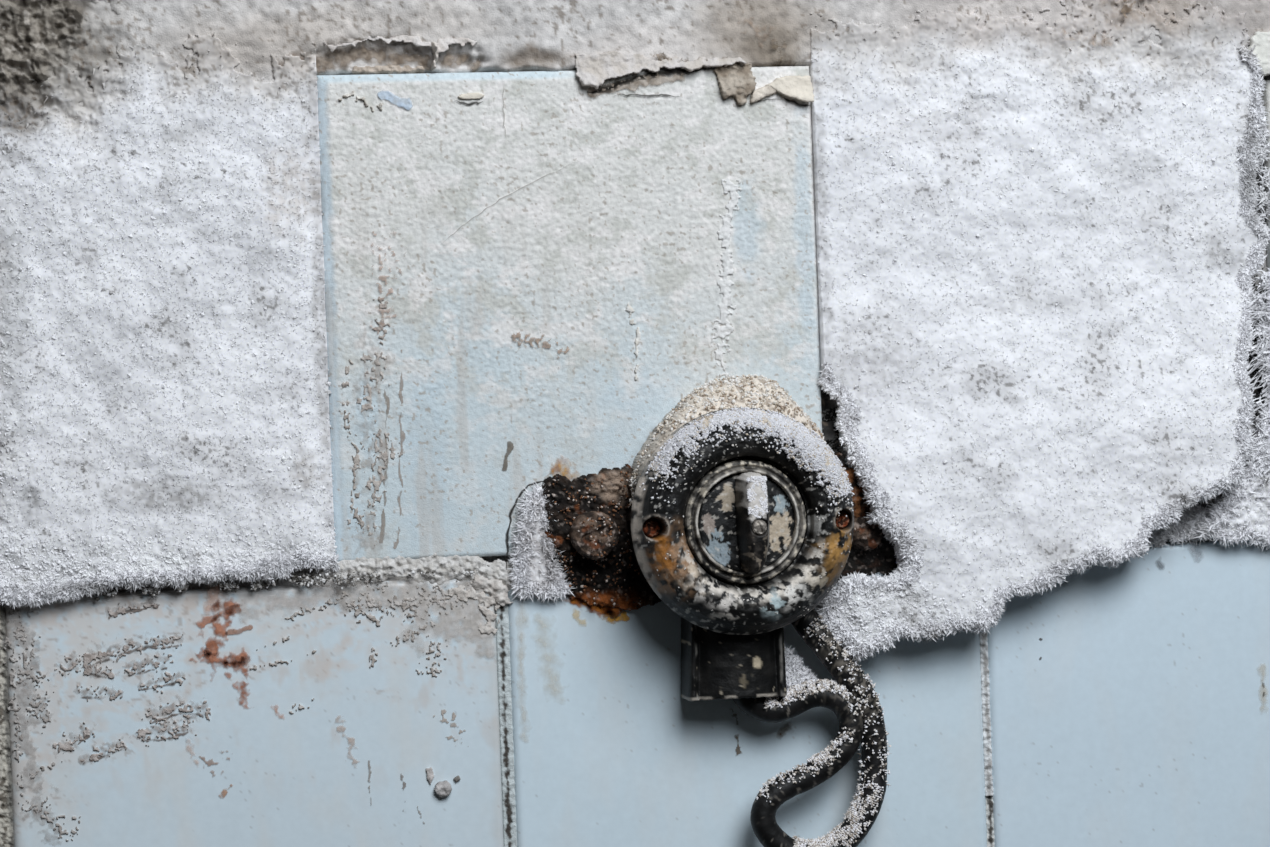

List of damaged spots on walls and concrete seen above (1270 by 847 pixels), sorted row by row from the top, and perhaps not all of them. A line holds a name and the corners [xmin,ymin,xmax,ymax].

flaking render [282,35,481,75]
peeling [1248,30,1270,77]
peeling [338,91,412,112]
peeling [713,63,814,105]
leakage [1246,315,1263,421]
leakage [822,407,846,456]
rust [547,462,643,624]
peeling [436,575,513,635]
rust [190,585,253,707]